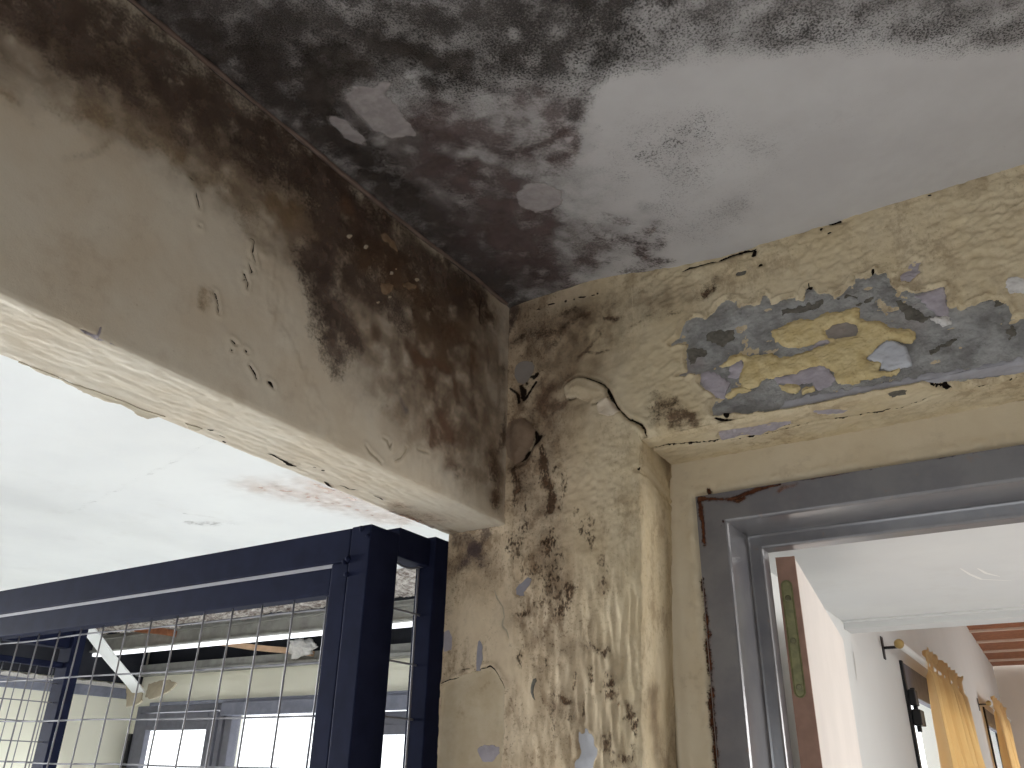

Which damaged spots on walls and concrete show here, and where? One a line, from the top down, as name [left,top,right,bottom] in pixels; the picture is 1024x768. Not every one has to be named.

water stain [850,0,1024,47]
peeling [330,81,416,144]
crack [682,249,762,272]
water stain [0,0,838,617]
spalling [671,262,1024,440]
corrosion [697,484,787,546]
corrosion [701,578,719,768]
peeling [575,728,598,768]
water stain [550,666,638,767]